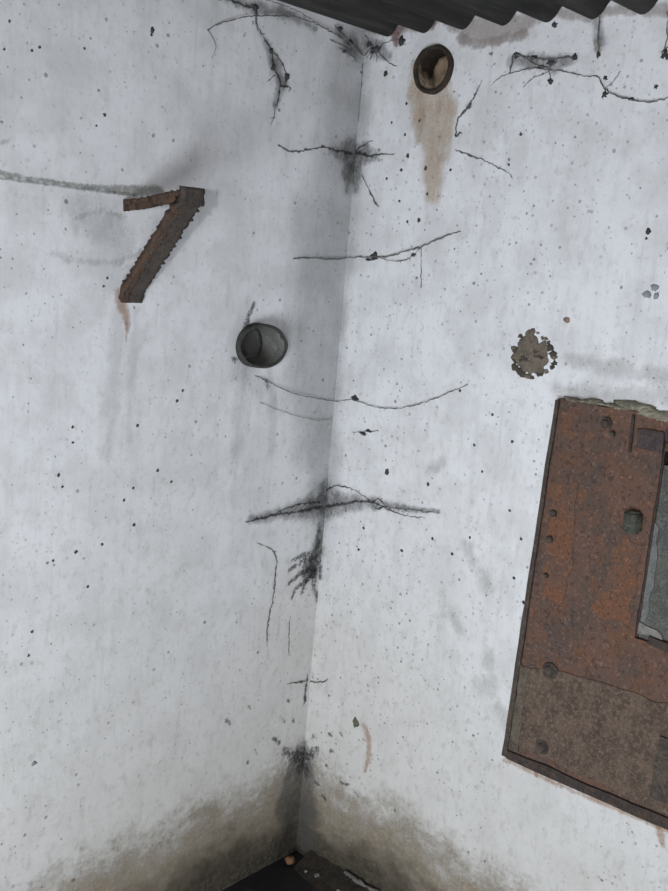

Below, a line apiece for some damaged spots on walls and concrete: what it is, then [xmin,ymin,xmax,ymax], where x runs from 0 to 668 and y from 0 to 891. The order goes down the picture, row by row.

crack [231,0,291,124]
crack [278,141,394,206]
crack [454,85,512,177]
rust [118,202,183,301]
spalling [511,328,558,379]
crack [246,484,438,522]
crack [258,543,291,651]
damp [59,736,504,891]